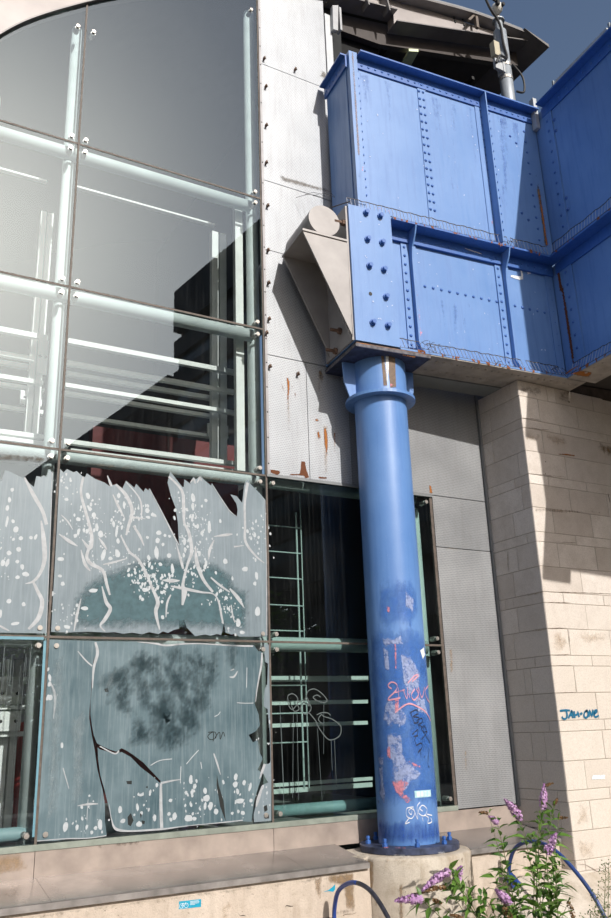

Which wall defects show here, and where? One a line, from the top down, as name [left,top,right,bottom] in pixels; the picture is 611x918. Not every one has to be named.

corrosion [530,188,557,256]
corrosion [381,356,396,387]
corrosion [271,461,327,479]